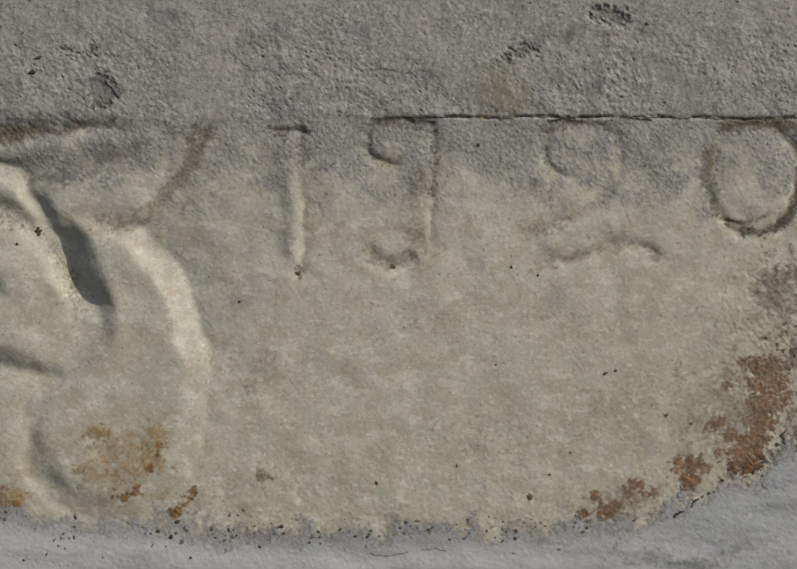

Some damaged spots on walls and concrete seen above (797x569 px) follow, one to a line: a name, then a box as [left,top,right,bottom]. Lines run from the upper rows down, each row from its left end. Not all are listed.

crack [371,115,797,125]
rust [667,344,795,493]
rust [74,427,165,502]
rust [573,477,662,521]